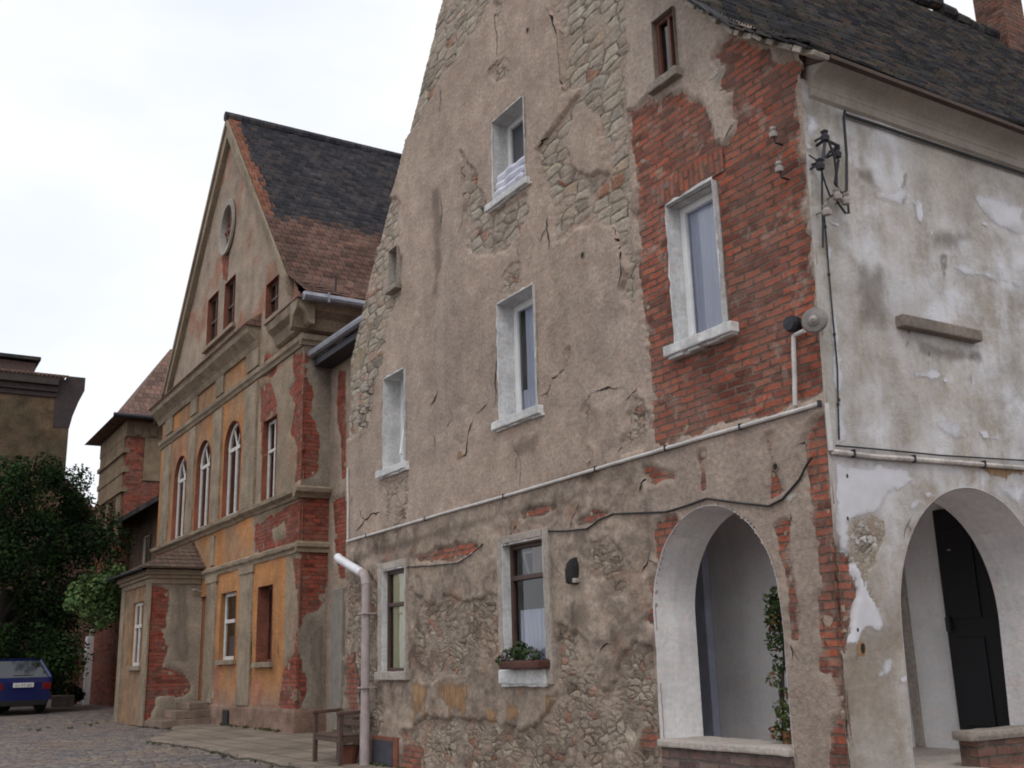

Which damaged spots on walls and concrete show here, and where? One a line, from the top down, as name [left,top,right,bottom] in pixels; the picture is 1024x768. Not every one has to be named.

spalling [462,152,529,256]
peeling [976,185,1023,233]
spalling [289,346,320,482]
crack [431,329,500,457]
spalling [540,0,914,768]
spalling [145,585,191,720]
spalling [254,495,385,743]
spalling [417,543,479,562]